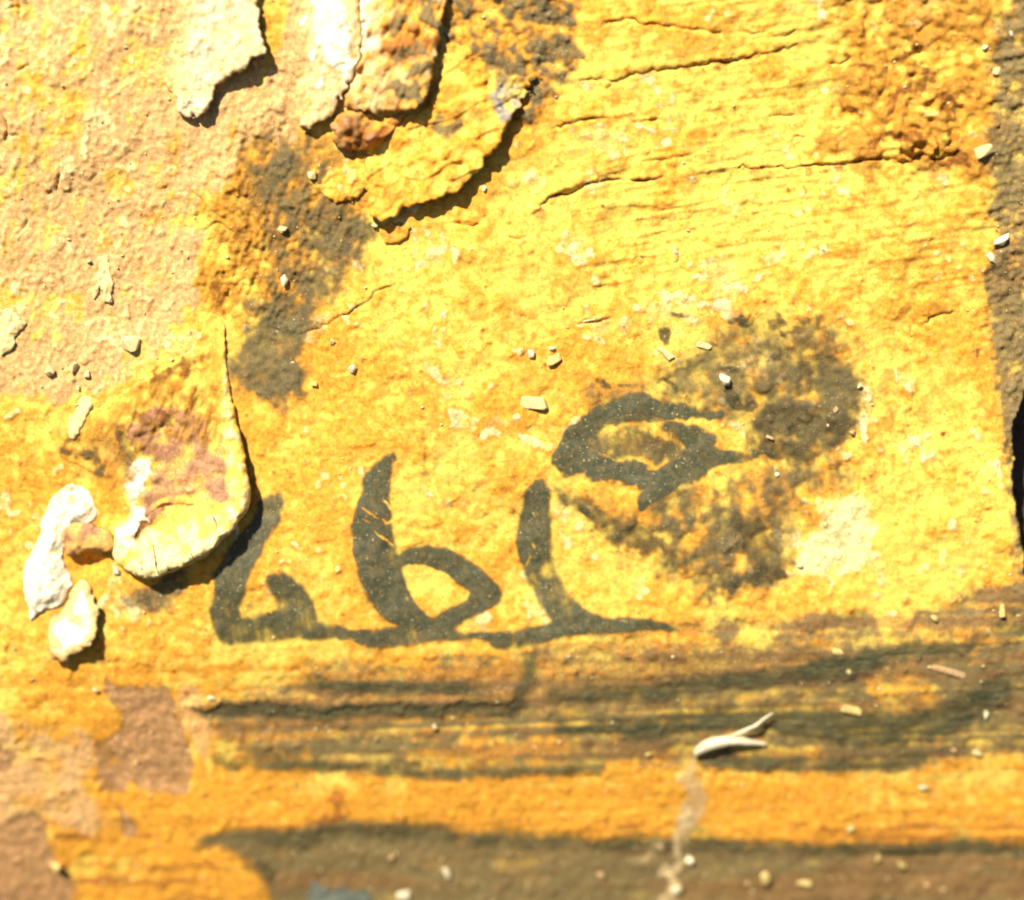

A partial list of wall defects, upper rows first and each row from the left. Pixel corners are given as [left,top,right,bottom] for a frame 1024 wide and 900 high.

peeling [163,0,266,119]
crack [602,18,721,34]
crack [579,32,798,89]
peeling [288,0,538,244]
crack [509,154,692,239]
crack [744,154,956,169]
water stain [229,132,371,410]
peeling [23,314,251,663]
water stain [562,313,859,600]
water stain [201,650,538,720]
water stain [548,625,1024,701]
water stain [212,750,606,782]